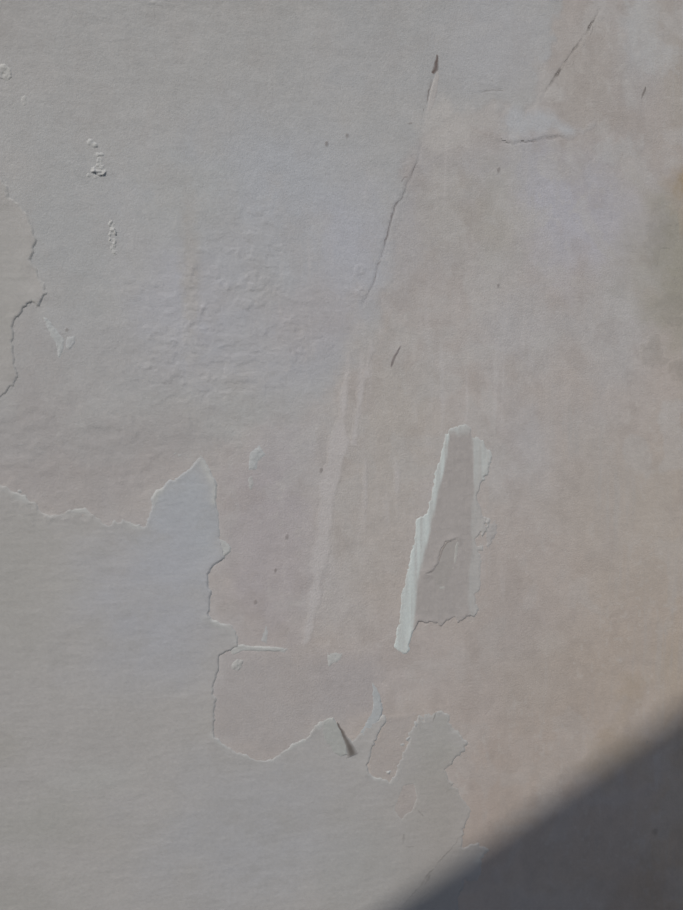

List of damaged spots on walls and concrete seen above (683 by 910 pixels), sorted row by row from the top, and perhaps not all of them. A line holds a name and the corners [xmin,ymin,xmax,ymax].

crack [545,13,600,93]
crack [364,55,439,300]